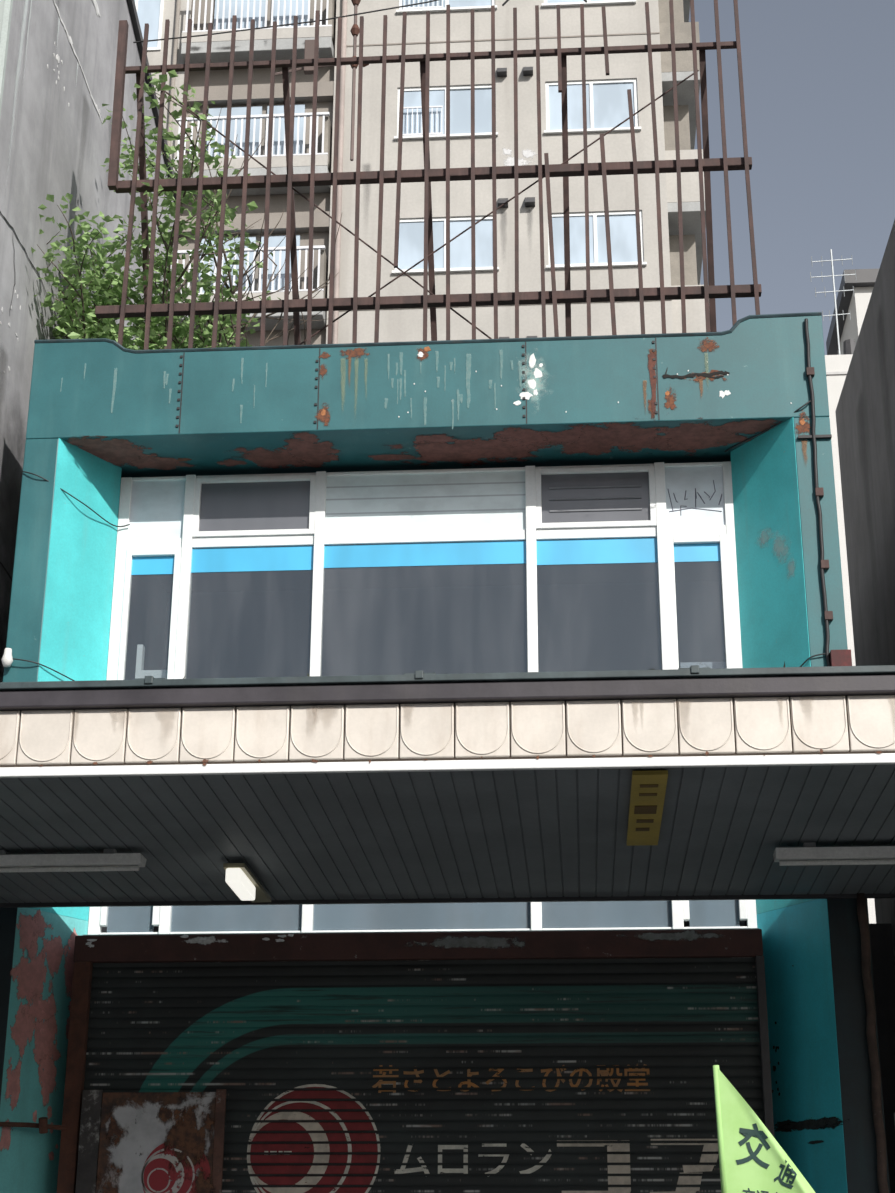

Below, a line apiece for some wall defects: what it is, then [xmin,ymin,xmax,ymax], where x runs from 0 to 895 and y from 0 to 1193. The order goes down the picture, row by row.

rust [697,337,719,352]
rust [319,348,370,380]
peeling [513,353,543,406]
rust [643,349,676,418]
rust [315,403,330,426]
peeling [367,411,777,466]
peeling [180,935,228,945]
peeling [409,936,525,949]
peeling [621,930,719,941]
peeling [0,909,97,1160]